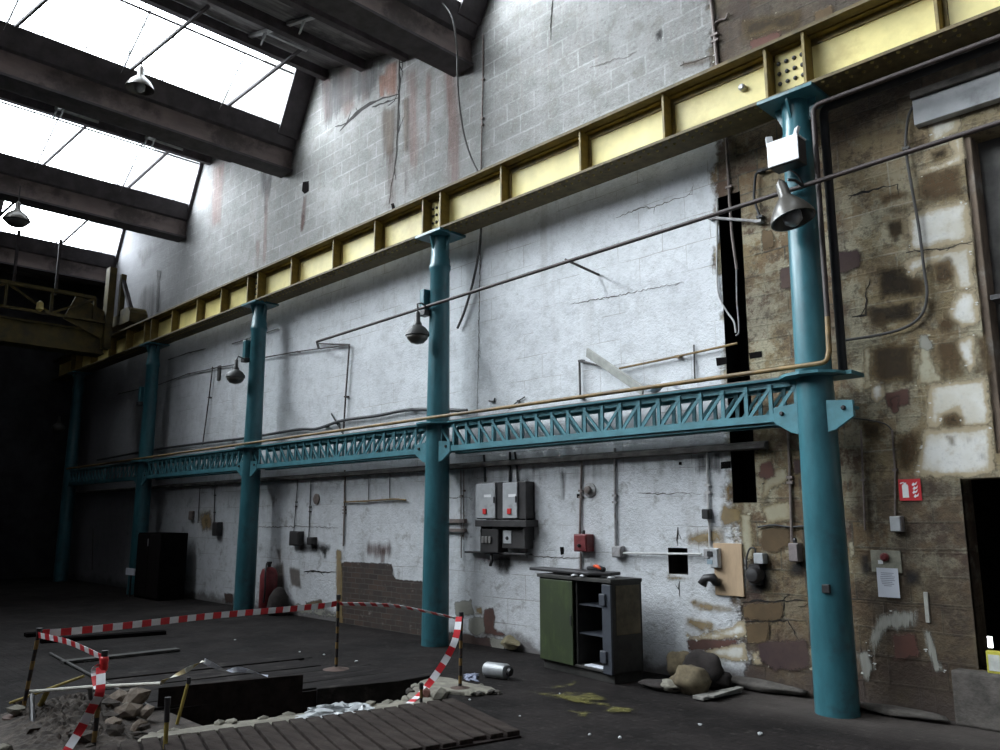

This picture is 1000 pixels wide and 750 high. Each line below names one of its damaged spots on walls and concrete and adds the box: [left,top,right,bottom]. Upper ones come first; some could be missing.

crack [335,60,404,203]
crack [848,184,899,199]
crack [573,282,680,304]
crack [852,281,870,317]
peeling [903,200,995,478]
leakage [936,317,963,376]
leakage [869,343,914,413]
leakage [862,420,884,439]
leakage [943,413,962,426]
flaking render [294,550,422,636]
peeling [449,599,520,651]
flaking render [686,602,812,695]